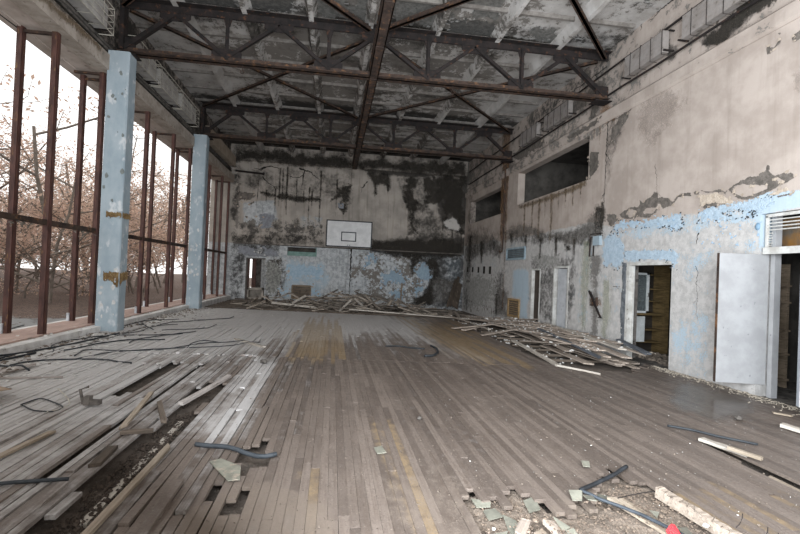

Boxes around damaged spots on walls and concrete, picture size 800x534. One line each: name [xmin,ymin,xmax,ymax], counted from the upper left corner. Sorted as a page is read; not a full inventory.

peeling [317,0,367,22]
peeling [393,0,438,27]
peeling [446,0,505,37]
peeling [528,26,557,43]
damp [703,0,777,45]
damp [235,141,499,307]
damp [505,181,606,257]
peeling [602,165,798,347]